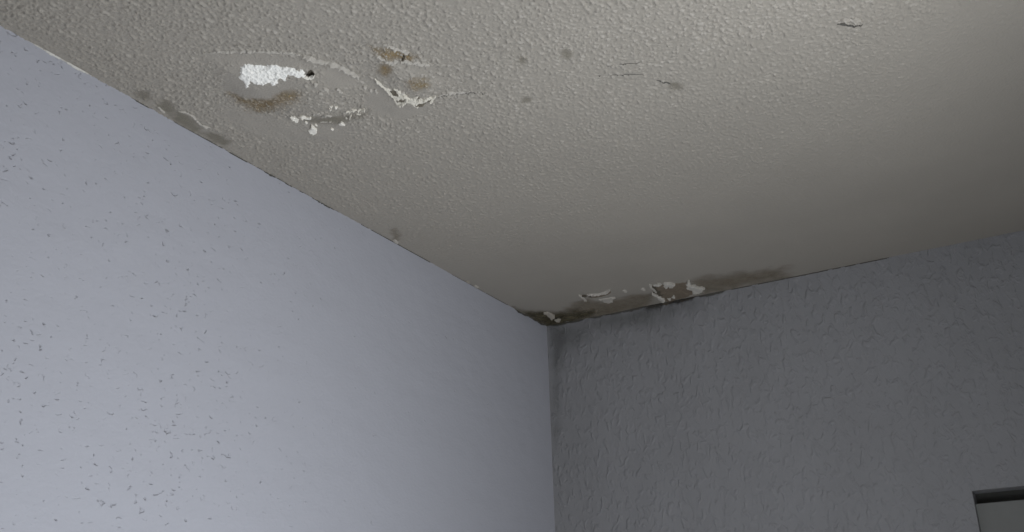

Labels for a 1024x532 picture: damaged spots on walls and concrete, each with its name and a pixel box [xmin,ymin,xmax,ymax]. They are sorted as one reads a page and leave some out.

peeling [202,50,436,135]
peeling [578,289,627,304]
spalling [641,280,705,303]